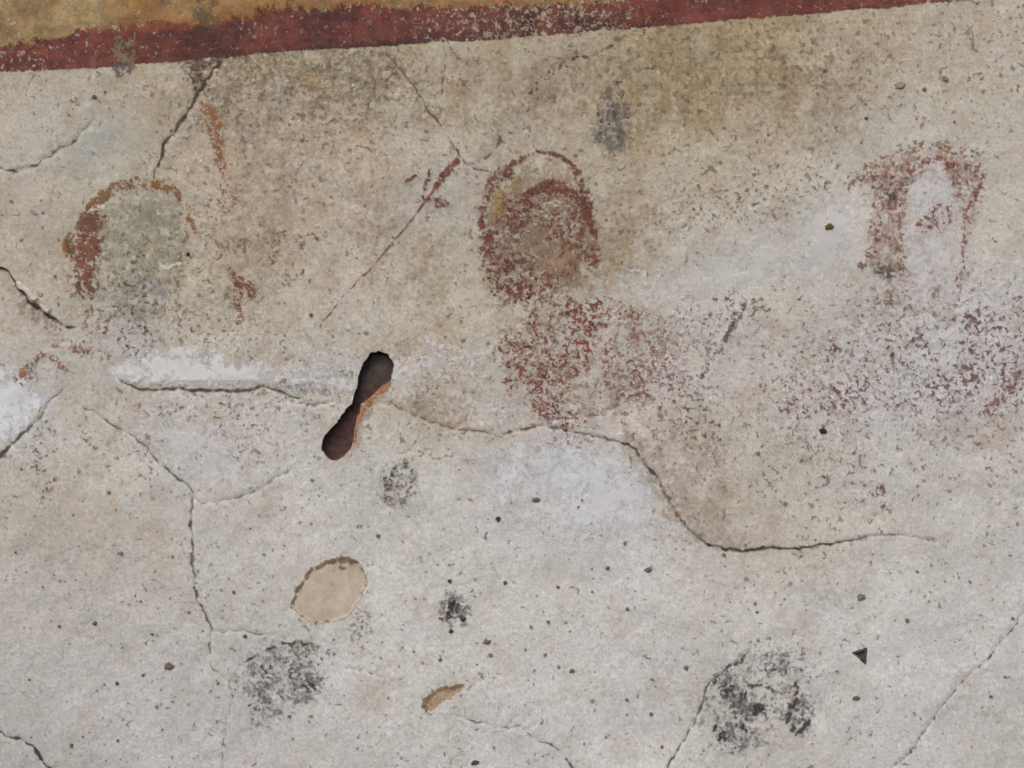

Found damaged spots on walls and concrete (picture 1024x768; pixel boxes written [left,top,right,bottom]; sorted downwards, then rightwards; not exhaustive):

crack [153,62,222,178]
water stain [594,81,629,153]
crack [0,267,75,329]
spalling [321,351,394,461]
water stain [383,462,414,506]
crack [388,394,685,525]
crack [706,536,866,552]
crack [83,407,286,768]
spalling [290,556,367,624]
water stain [236,641,327,725]
spalling [421,684,471,715]
water stain [705,637,813,754]